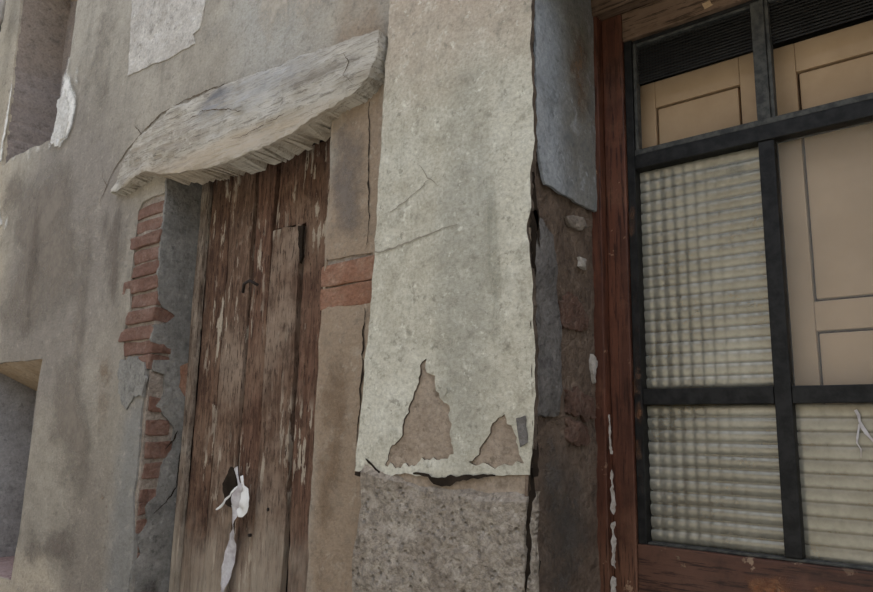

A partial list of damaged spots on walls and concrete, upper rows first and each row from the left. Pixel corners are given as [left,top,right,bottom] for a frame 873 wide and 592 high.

spalling [564,215,587,231]
flaking render [118,200,174,369]
flaking render [135,396,172,534]
peeling [386,361,454,468]
peeling [470,415,528,469]
spalling [589,354,598,383]